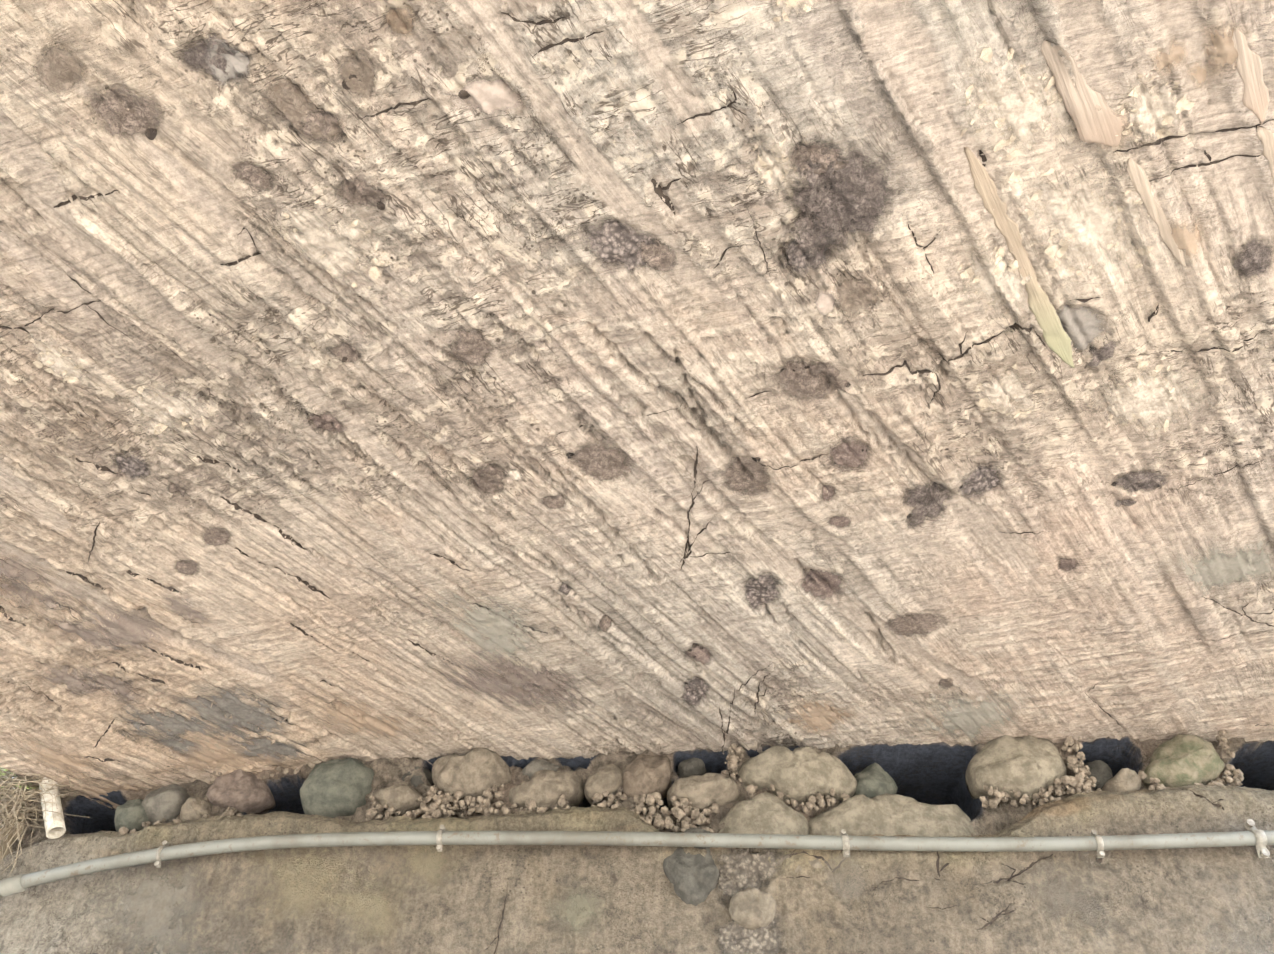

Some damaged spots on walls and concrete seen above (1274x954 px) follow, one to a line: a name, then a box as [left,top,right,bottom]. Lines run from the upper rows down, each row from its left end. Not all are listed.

peeling [960,47,1154,285]
crack [1113,119,1274,182]
crack [0,274,130,338]
crack [863,323,1046,401]
peeling [956,246,1030,316]
spalling [1056,305,1116,366]
crack [680,446,730,569]